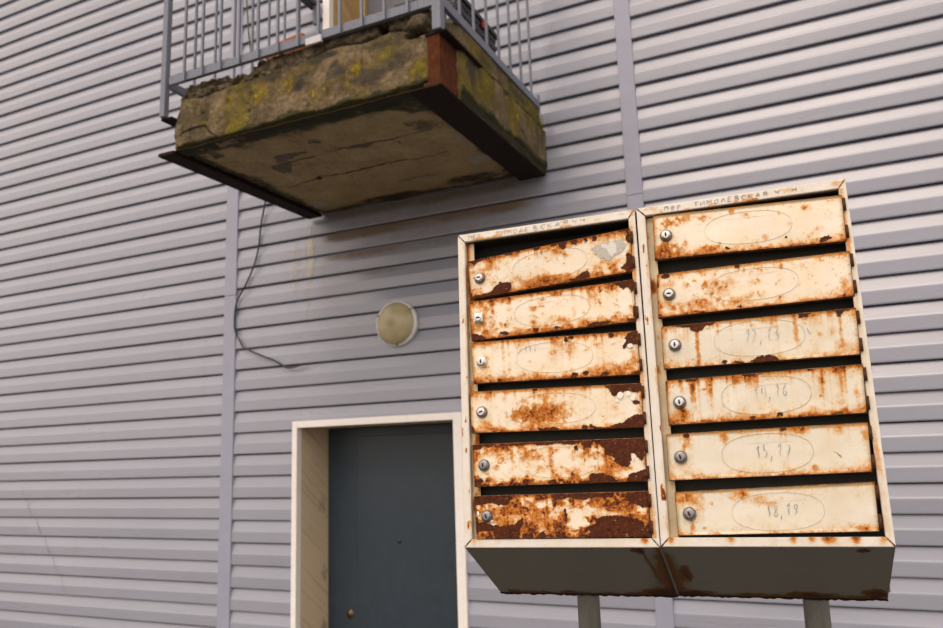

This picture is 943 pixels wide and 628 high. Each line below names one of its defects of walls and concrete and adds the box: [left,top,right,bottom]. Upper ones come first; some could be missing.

water stain [239,40,406,104]
crack [285,128,447,186]